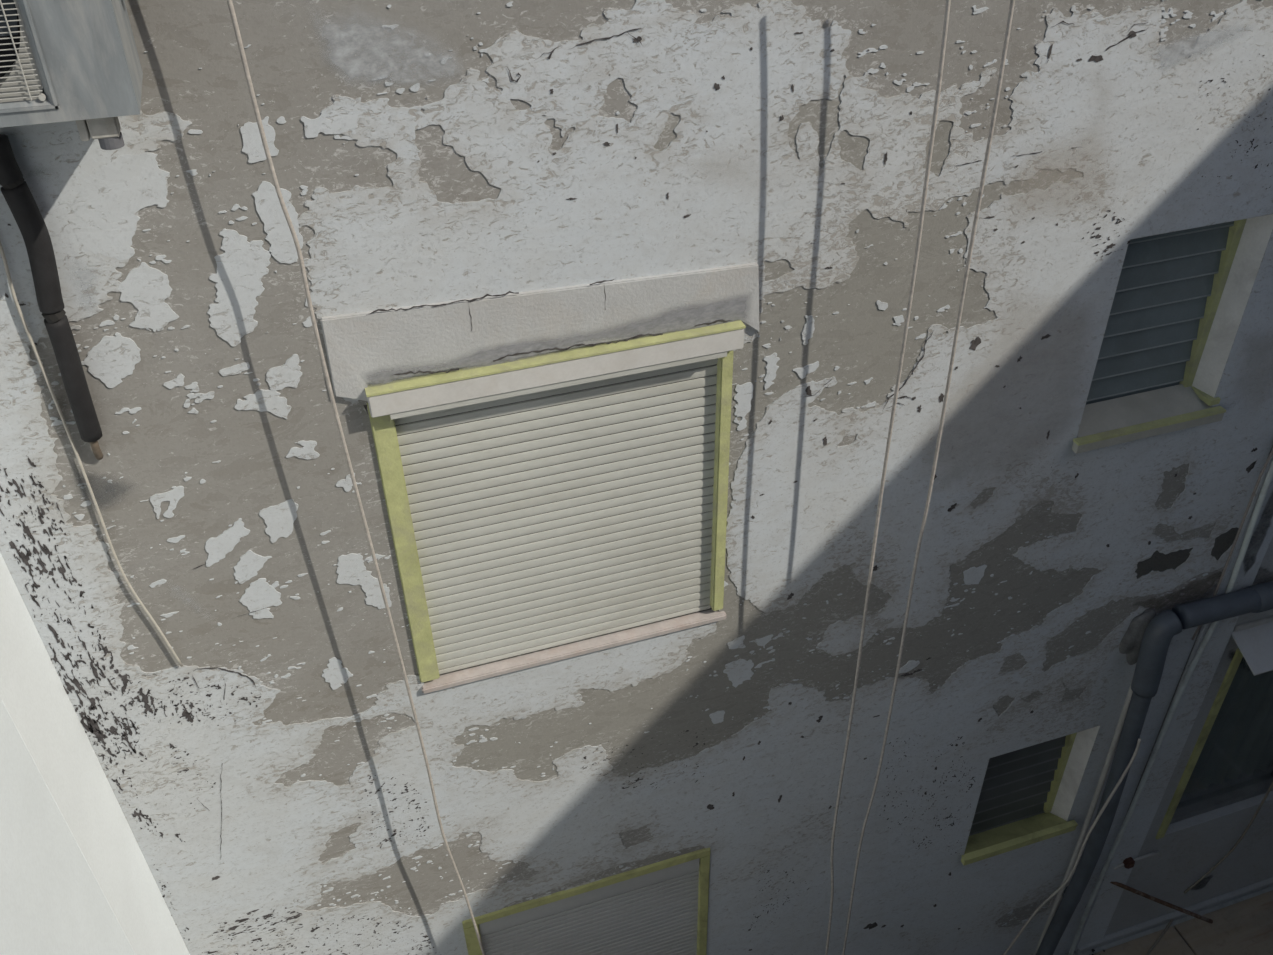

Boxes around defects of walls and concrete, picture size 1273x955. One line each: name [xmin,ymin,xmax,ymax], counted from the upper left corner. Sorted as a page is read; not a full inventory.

peeling [665,0,762,24]
peeling [780,0,1273,177]
peeling [654,113,681,151]
peeling [1082,209,1134,257]
crack [394,367,459,375]
crack [367,291,519,331]
crack [493,334,663,362]
crack [695,318,731,326]
peeling [726,165,1083,526]
peeling [0,0,638,955]
peeling [1042,516,1239,671]
peeling [451,500,1102,789]